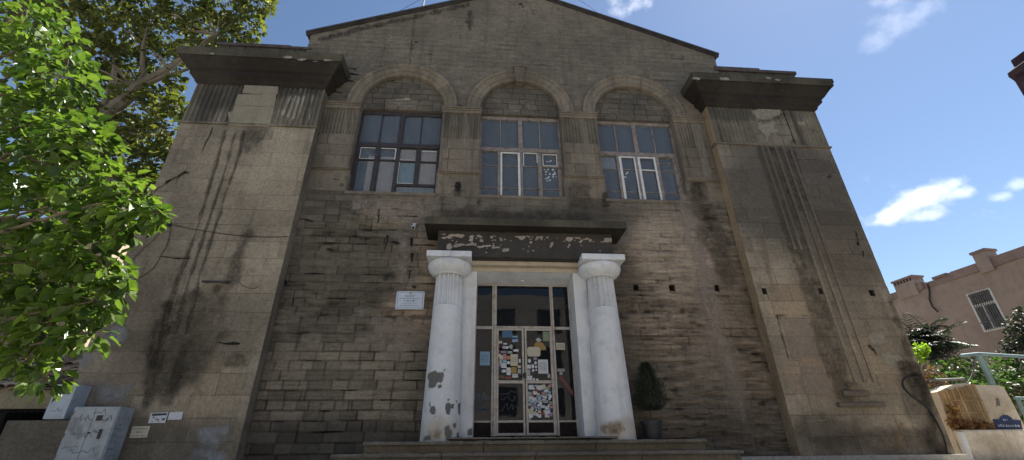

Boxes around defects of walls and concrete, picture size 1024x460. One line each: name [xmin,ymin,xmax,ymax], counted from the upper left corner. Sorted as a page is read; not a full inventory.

spalling [753,109,780,142]
peeling [441,234,612,253]
damp [143,126,262,406]
damp [758,145,850,399]
peeling [428,369,445,388]
damp [900,340,941,454]
peeling [429,399,472,439]